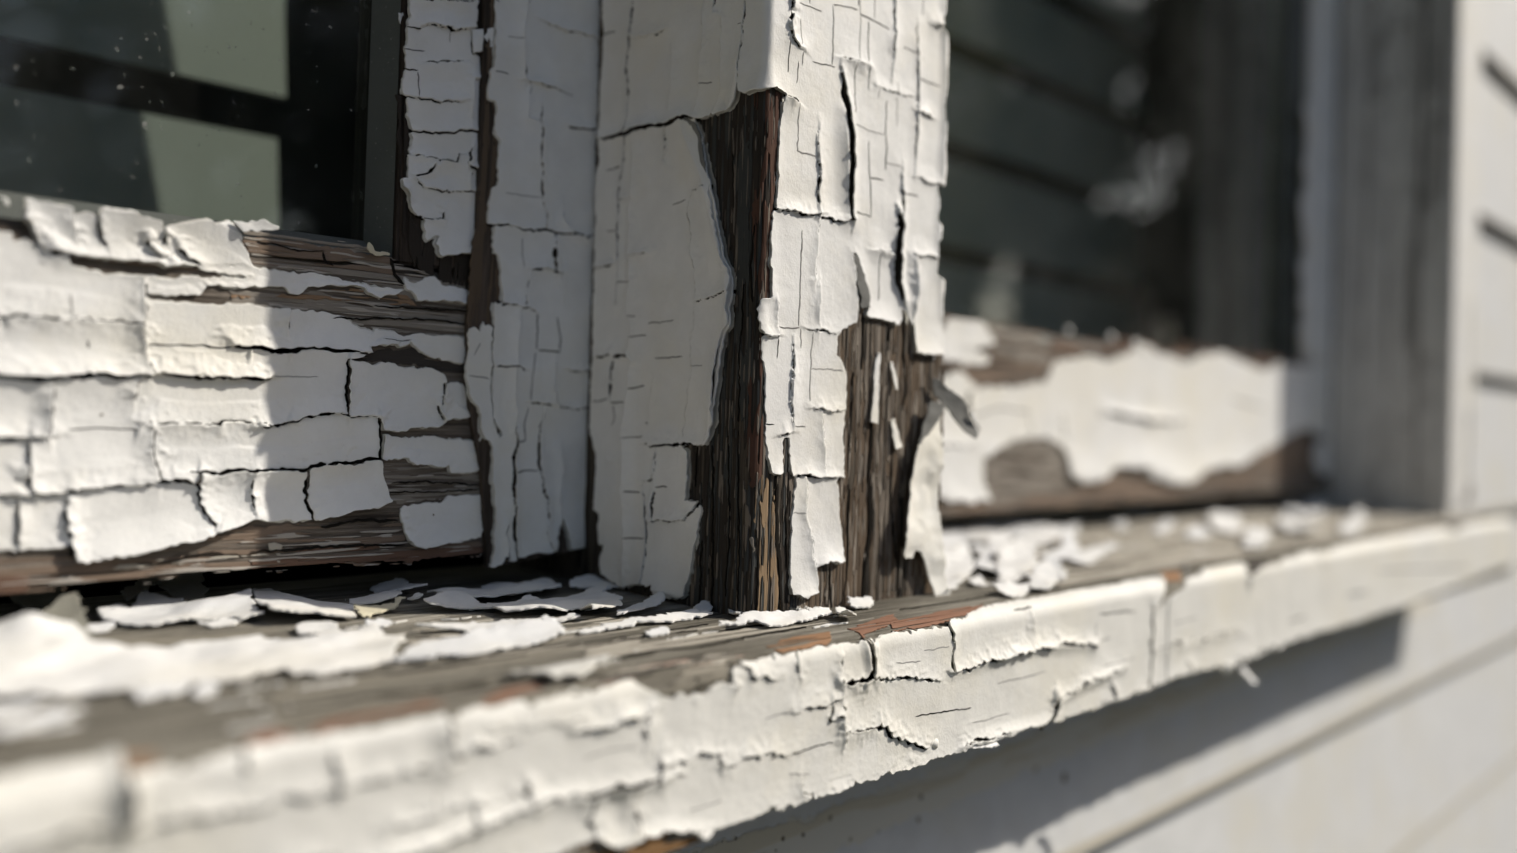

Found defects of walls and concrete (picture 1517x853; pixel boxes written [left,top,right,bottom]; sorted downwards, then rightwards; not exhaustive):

crack [73,213,106,246]
crack [0,237,410,561]
crack [403,0,737,561]
peeling [0,0,1337,746]
crack [791,474,841,514]
peeling [1021,496,1465,607]
peeling [563,831,701,853]
crack [454,610,1230,850]